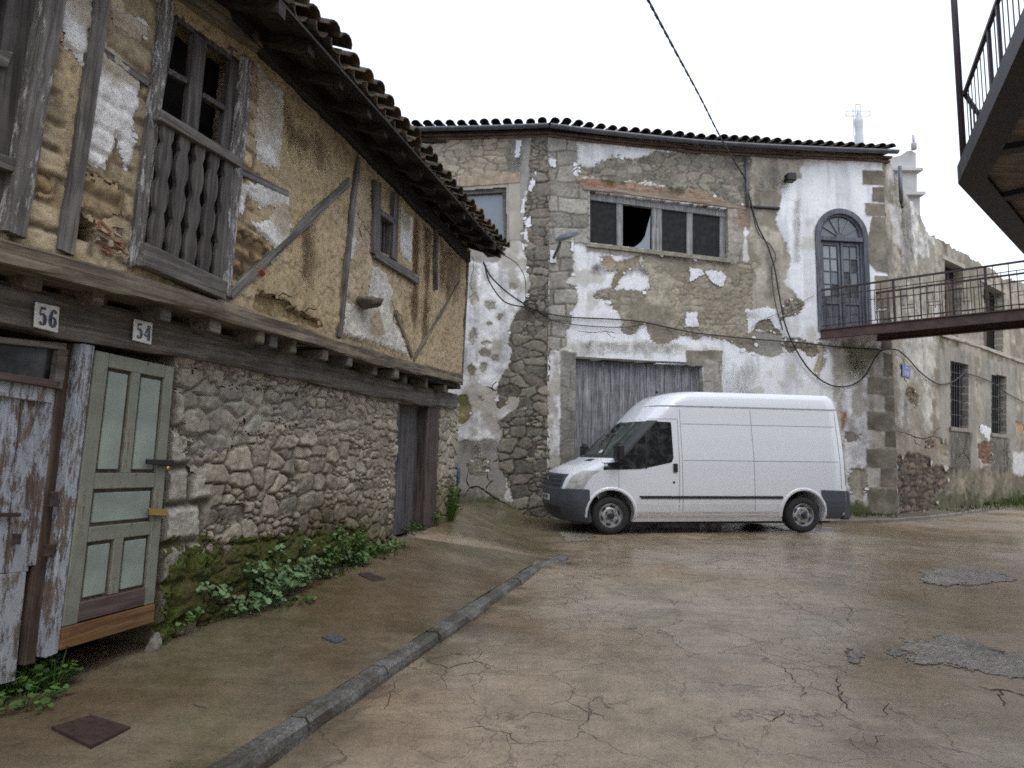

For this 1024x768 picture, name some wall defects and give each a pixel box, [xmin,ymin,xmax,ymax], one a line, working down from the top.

flaking render [60,0,93,67]
flaking render [110,2,150,43]
flaking render [78,42,140,265]
flaking render [231,181,293,287]
flaking render [458,134,752,518]
flaking render [592,254,824,376]
spalling [897,438,950,514]
spalling [919,566,1023,586]
spalling [884,633,1024,679]
crack [691,665,807,750]
crack [836,676,889,743]